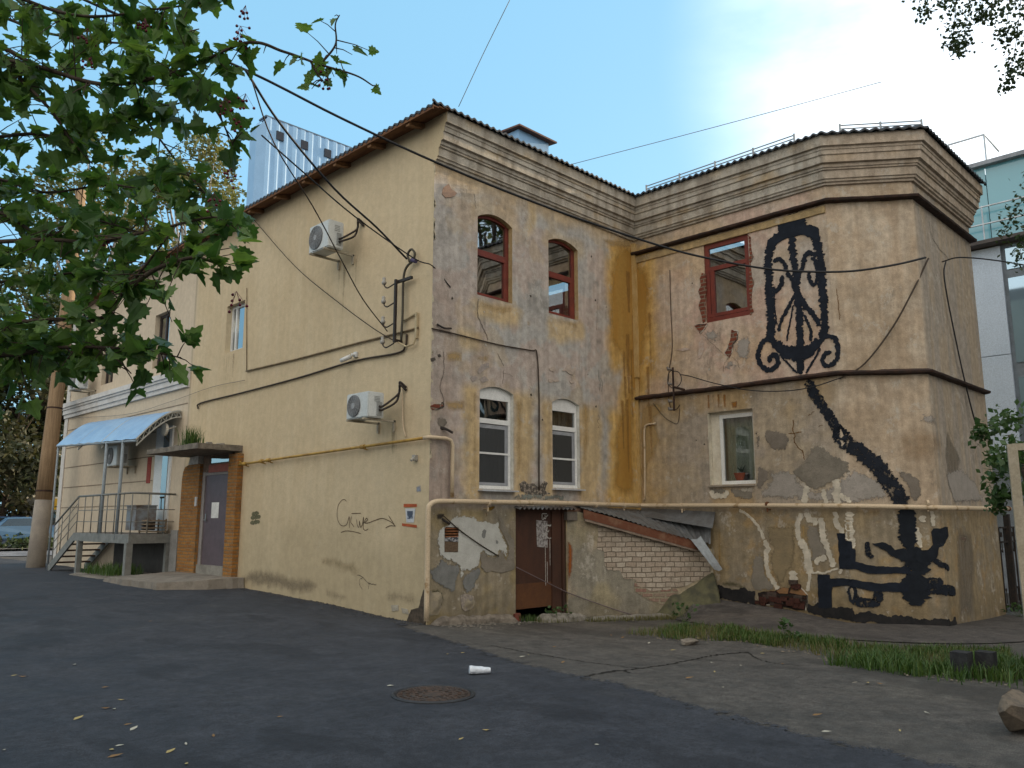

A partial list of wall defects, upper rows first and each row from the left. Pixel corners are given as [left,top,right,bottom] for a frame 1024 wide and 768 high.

flaking render [692,273,708,334]
damp [612,250,661,491]
flaking render [724,330,739,358]
peeling [438,516,508,577]